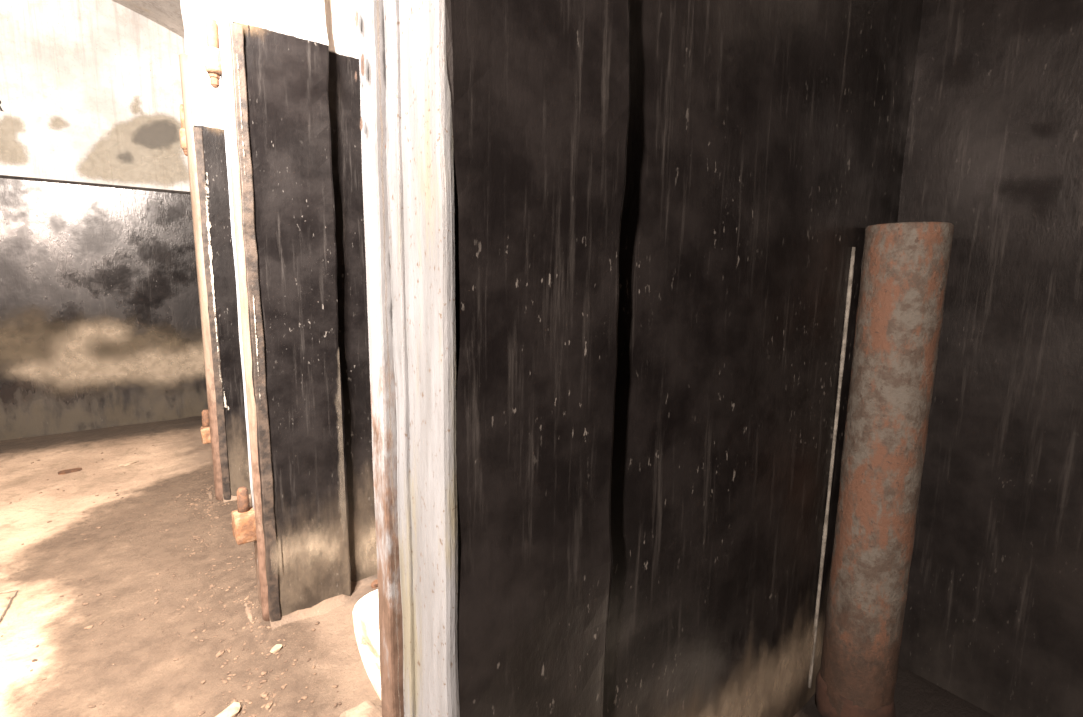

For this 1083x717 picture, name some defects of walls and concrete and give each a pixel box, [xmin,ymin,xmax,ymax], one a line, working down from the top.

leakage [0,117,26,163]
leakage [80,99,189,184]
leakage [0,316,205,387]
leakage [6,465,315,717]